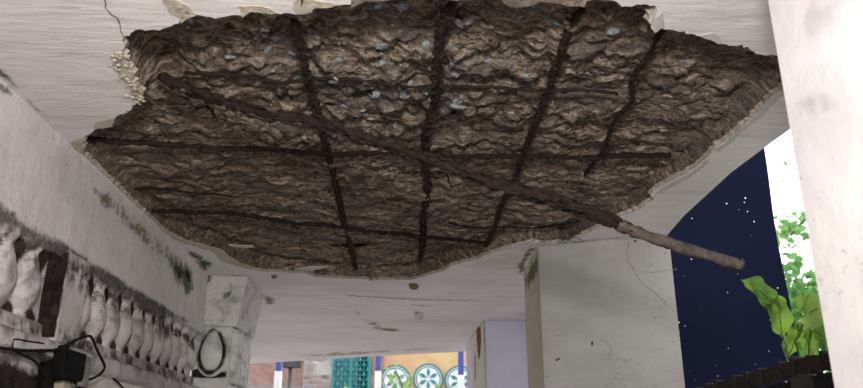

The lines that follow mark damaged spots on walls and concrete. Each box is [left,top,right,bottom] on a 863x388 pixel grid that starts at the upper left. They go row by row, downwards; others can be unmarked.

spalling [71,0,784,281]